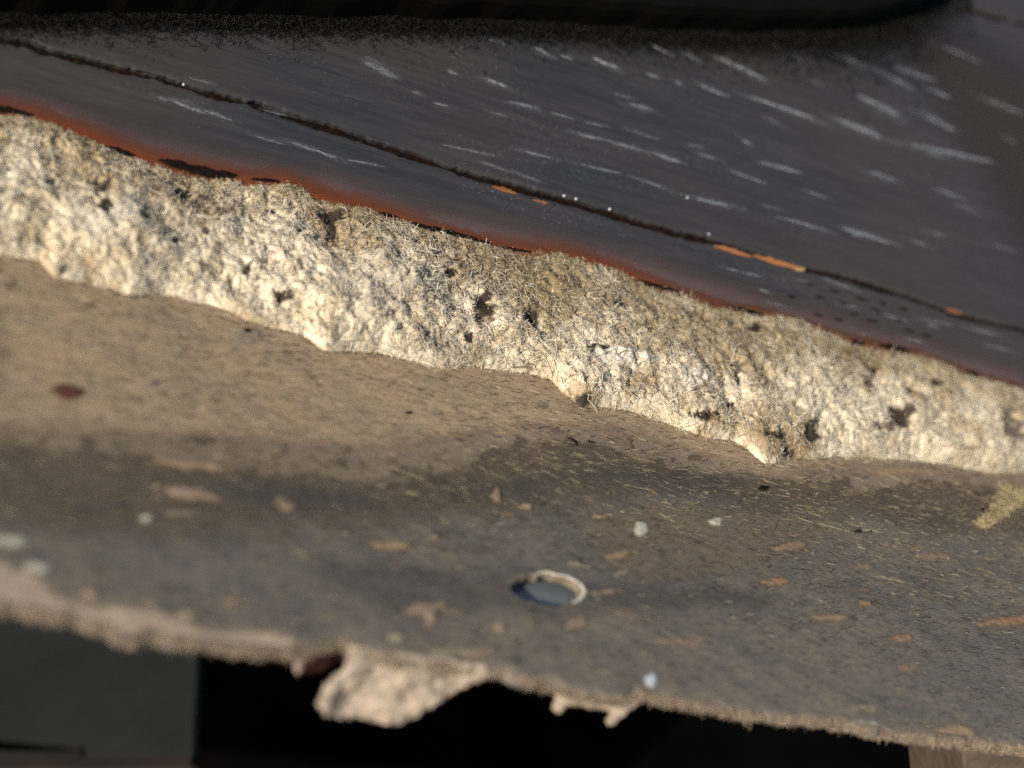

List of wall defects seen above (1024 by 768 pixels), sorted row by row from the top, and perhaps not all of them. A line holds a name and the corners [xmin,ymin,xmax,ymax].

crack [0,38,752,254]
spalling [94,180,112,212]
spalling [175,190,193,200]
spalling [319,208,346,244]
crack [639,279,680,292]
crack [730,305,764,315]
crack [803,269,1024,333]
peeling [0,256,1024,532]
peeling [635,522,649,536]